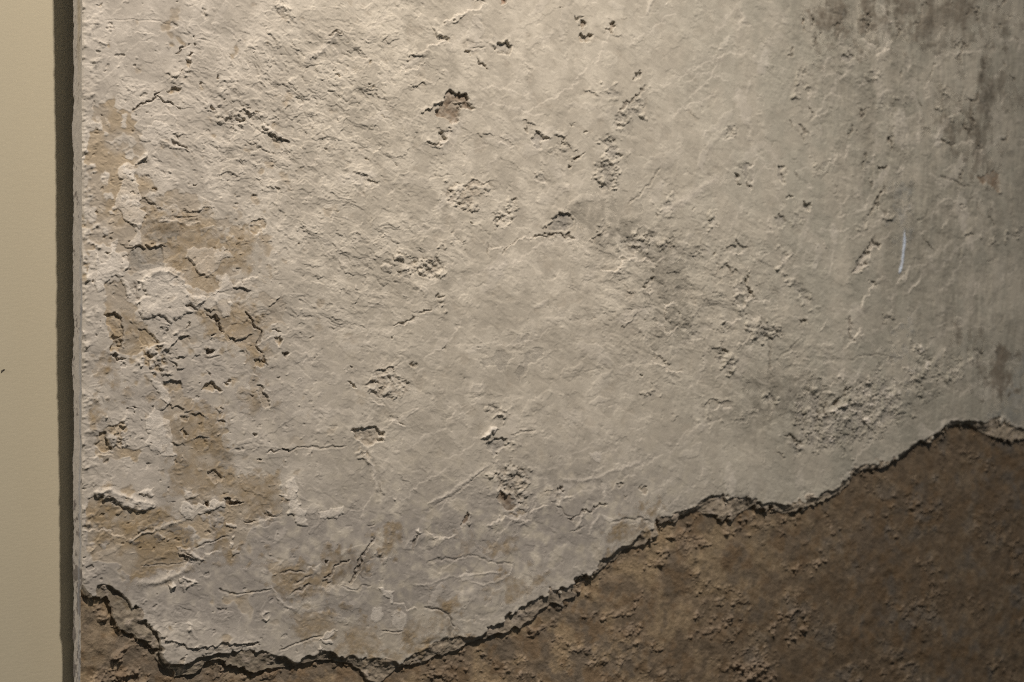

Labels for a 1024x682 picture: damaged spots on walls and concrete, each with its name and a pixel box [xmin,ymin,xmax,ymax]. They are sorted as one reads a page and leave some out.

crack [132,91,182,112]
spalling [420,89,478,148]
crack [139,195,215,226]
crack [231,273,282,355]
spalling [347,361,419,496]
spalling [207,469,226,485]
spalling [480,404,575,528]
flaking render [180,490,246,521]
peeling [226,477,345,556]
crack [143,535,232,567]
crack [220,585,298,612]
peeling [155,630,261,654]